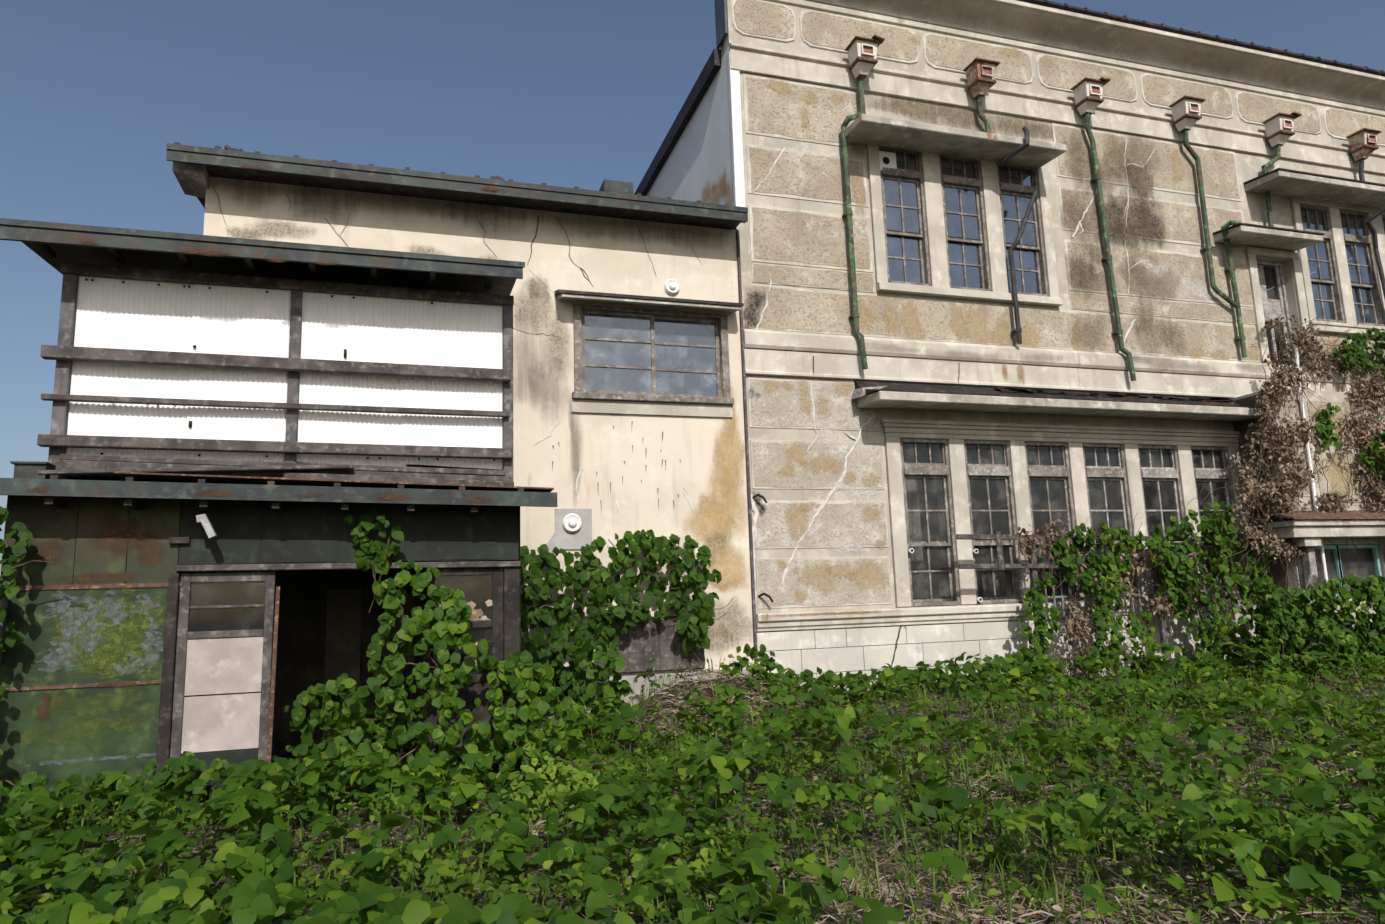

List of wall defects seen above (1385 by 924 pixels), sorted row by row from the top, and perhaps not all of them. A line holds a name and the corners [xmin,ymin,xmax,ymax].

water stain [891,101,1053,135]
crack [479,216,593,293]
water stain [1066,139,1212,351]
rust [113,471,554,503]
water stain [691,386,744,590]
crack [751,356,876,603]